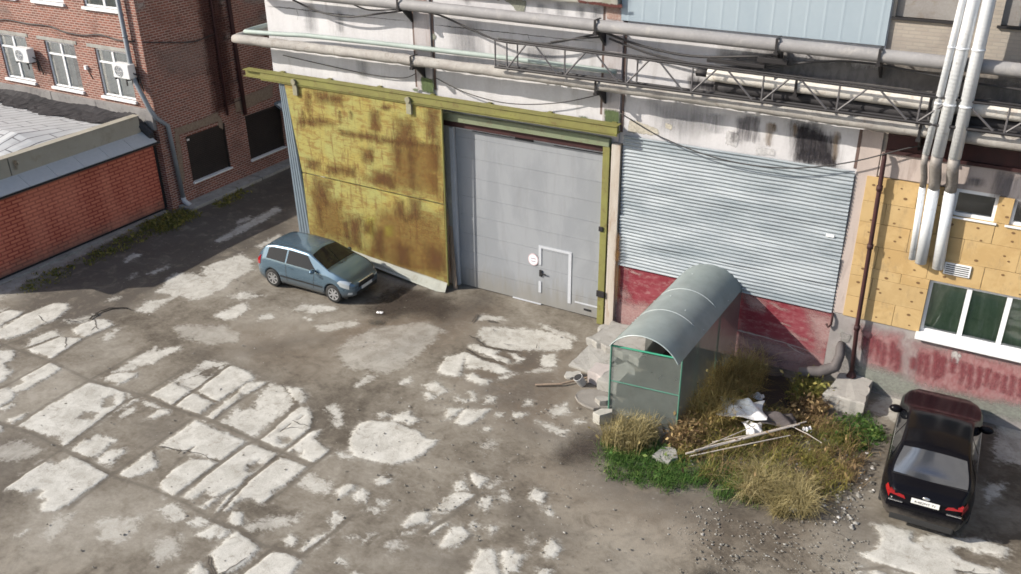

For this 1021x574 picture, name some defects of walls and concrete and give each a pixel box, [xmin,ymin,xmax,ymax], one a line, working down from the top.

damp [733,117,758,140]
damp [795,122,836,167]
rust [315,181,444,275]
crack [40,307,131,348]
peeling [615,291,648,325]
peeling [744,294,786,310]
peeling [781,309,1021,405]
spalling [751,375,796,410]